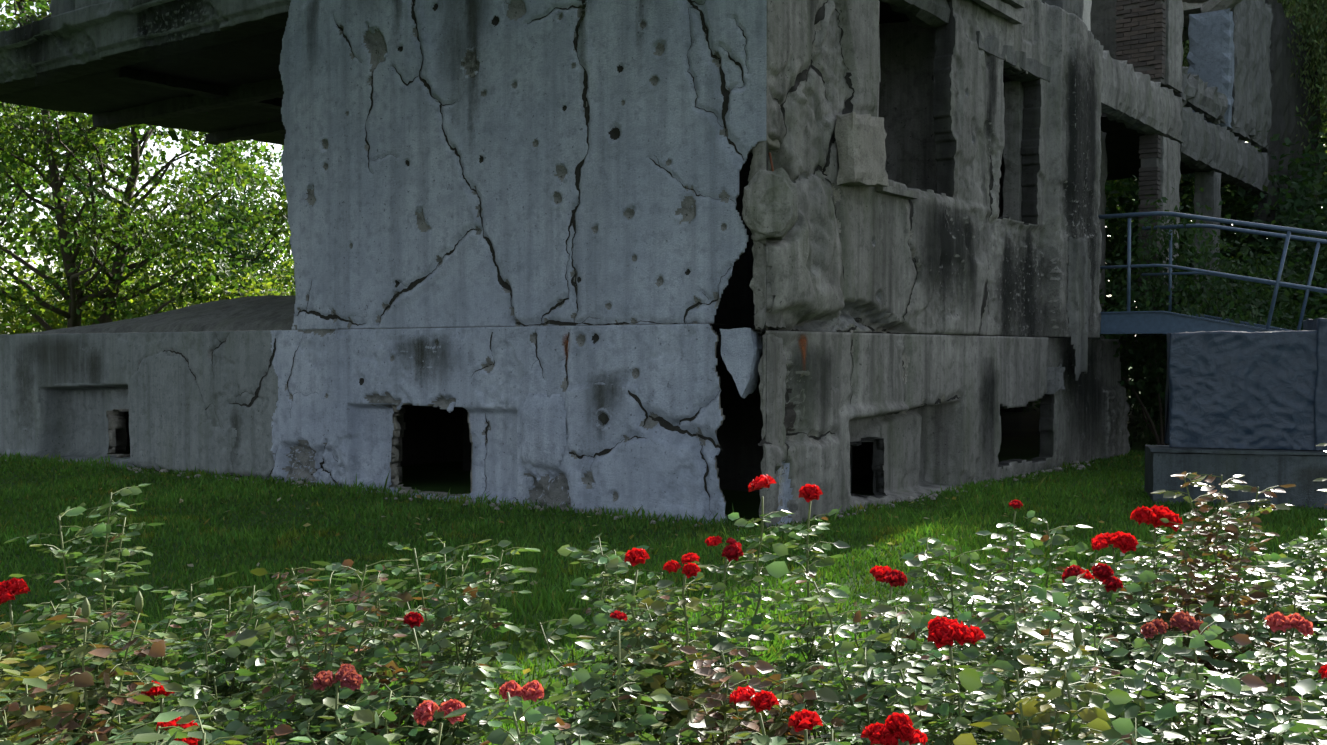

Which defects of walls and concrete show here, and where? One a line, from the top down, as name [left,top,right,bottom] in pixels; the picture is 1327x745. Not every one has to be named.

crack [687,0,748,160]
crack [137,0,733,425]
crack [774,0,962,418]
leakage [926,208,975,286]
leakage [998,232,1048,337]
leakage [1063,67,1096,259]
spalling [279,440,319,485]
spalling [524,469,595,509]
crack [569,390,723,523]
crack [758,428,835,461]